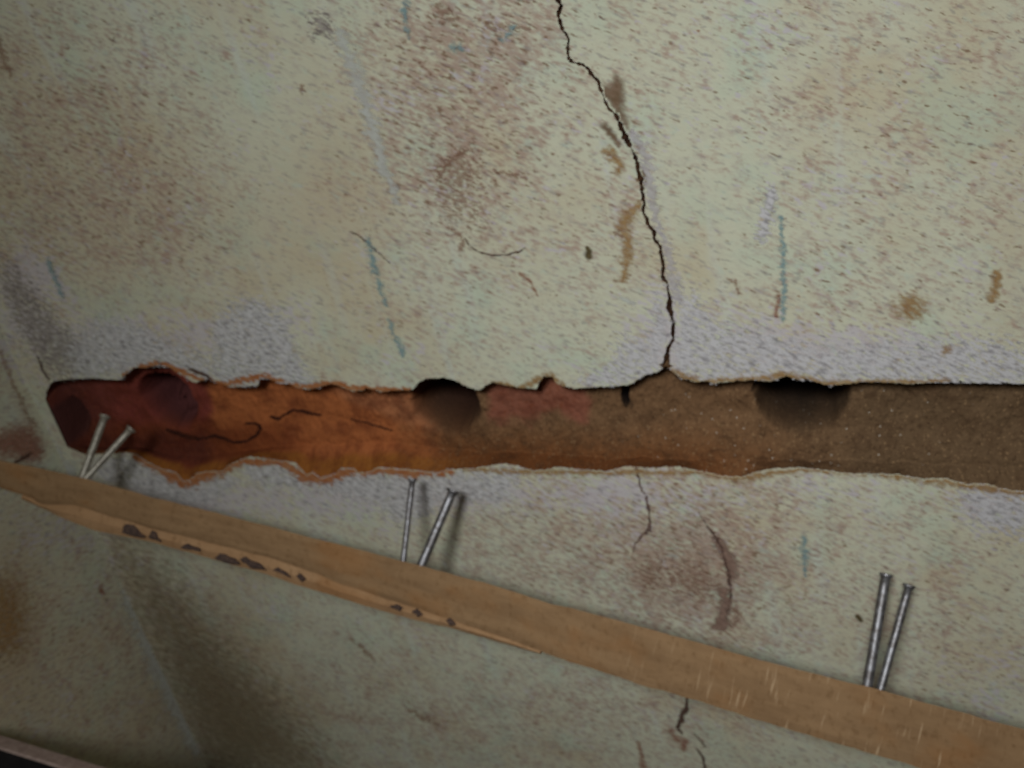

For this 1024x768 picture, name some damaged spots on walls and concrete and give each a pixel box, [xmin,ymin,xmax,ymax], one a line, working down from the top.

crack [555,0,682,367]
flaking render [46,291,528,534]
crack [633,467,652,552]